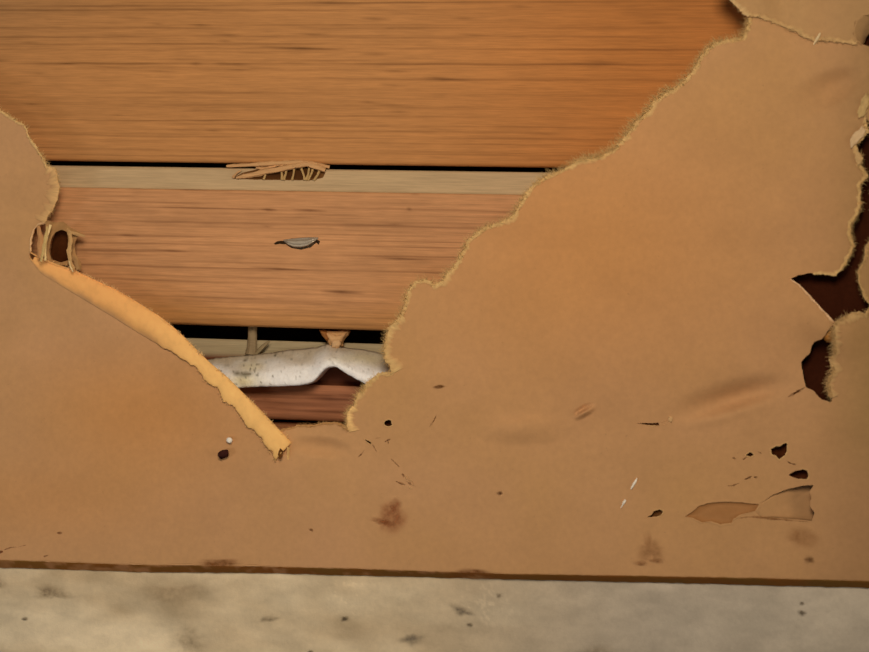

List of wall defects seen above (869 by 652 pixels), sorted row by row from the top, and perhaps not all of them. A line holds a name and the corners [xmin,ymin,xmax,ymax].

spalling [233,168,325,180]
peeling [683,499,761,527]